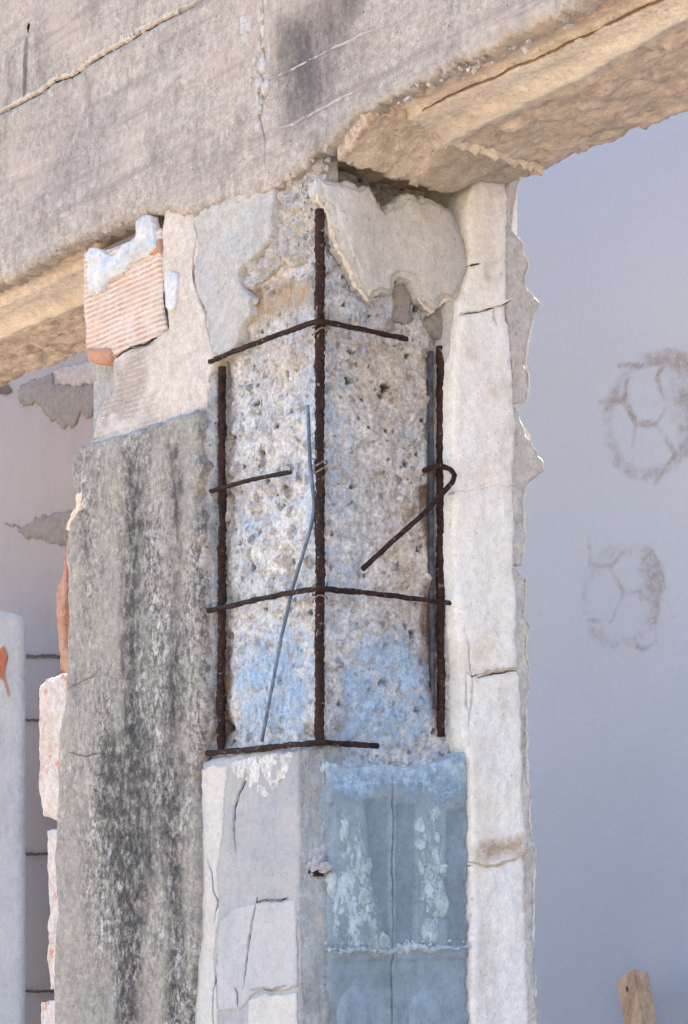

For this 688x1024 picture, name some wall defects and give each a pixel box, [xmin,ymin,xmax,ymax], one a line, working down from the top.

crack [0,0,197,114]
spalling [390,33,535,110]
crack [422,0,664,112]
spalling [150,239,164,255]
spalling [17,348,116,429]
spalling [5,492,84,547]
corrosion [419,484,429,544]
spalling [195,156,467,1024]
corrosion [420,576,438,714]
corrosion [215,648,234,741]
water stain [98,463,182,1020]